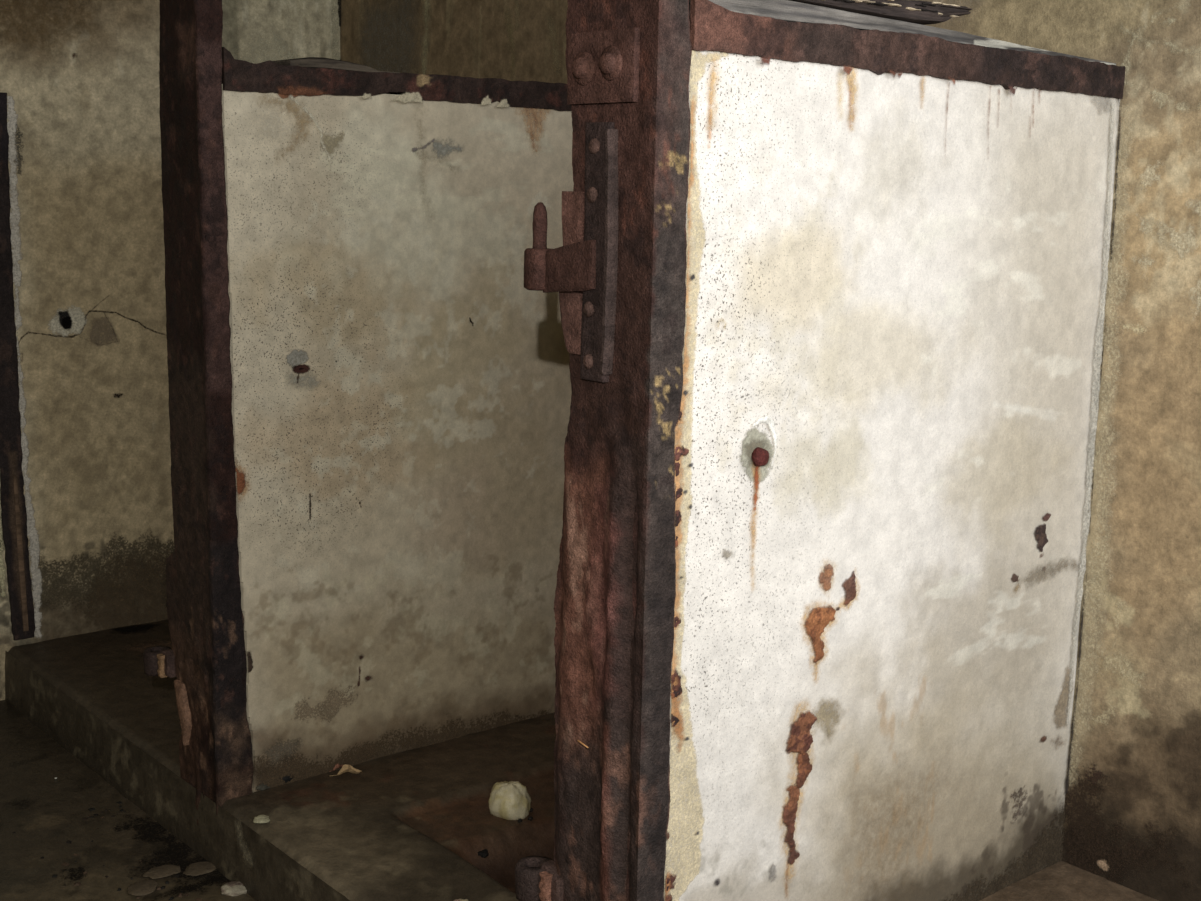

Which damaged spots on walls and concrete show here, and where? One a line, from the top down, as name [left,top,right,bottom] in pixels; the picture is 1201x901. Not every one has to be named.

rust [840,66,857,119]
spalling [48,306,117,346]
crack [18,306,165,343]
leakage [29,530,175,653]
leakage [944,764,1184,901]